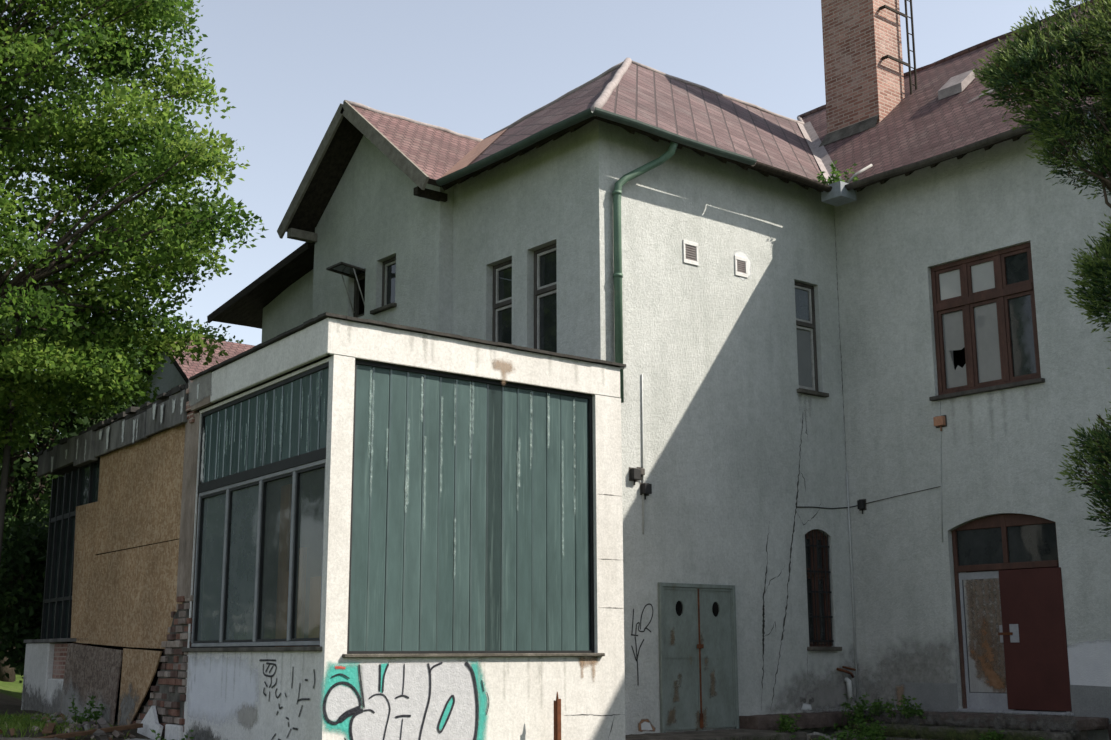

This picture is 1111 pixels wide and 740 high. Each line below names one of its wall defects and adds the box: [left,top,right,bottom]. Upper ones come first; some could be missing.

corrosion [493,361,512,376]
crack [761,412,821,710]
corrosion [965,579,1006,692]